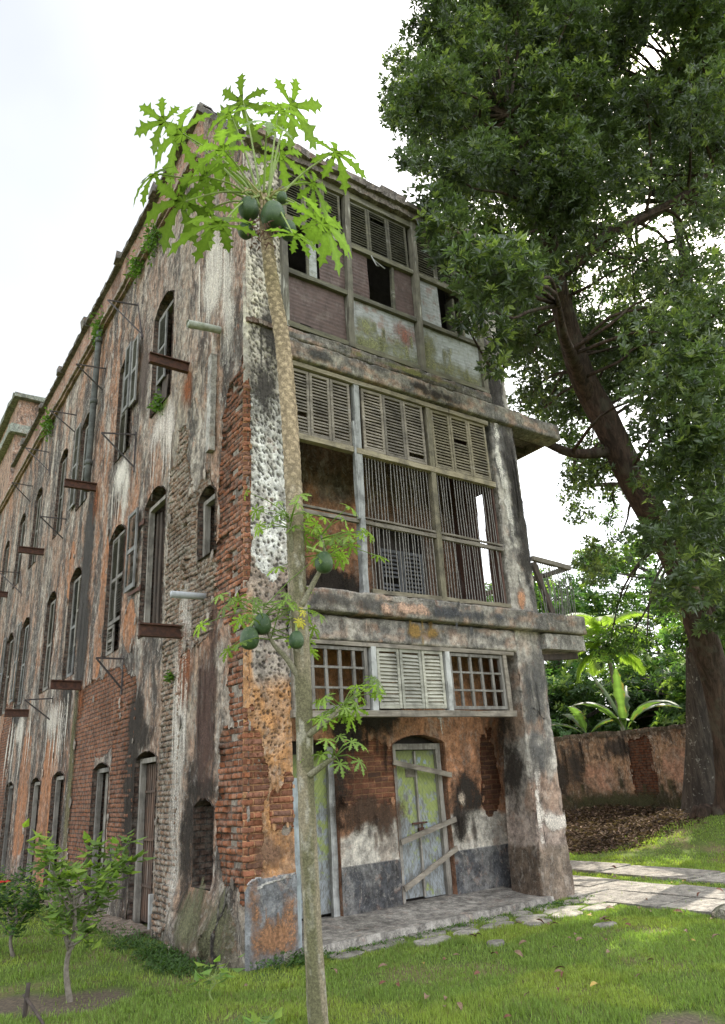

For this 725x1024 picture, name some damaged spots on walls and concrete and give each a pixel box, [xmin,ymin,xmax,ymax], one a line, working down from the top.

damp [405,337,459,412]
spalling [151,355,296,938]
spalling [66,527,137,882]
damp [172,602,218,822]
spalling [336,738,418,806]
spalling [480,727,502,817]
damp [604,734,631,760]
spalling [628,735,685,797]
damp [456,786,477,839]